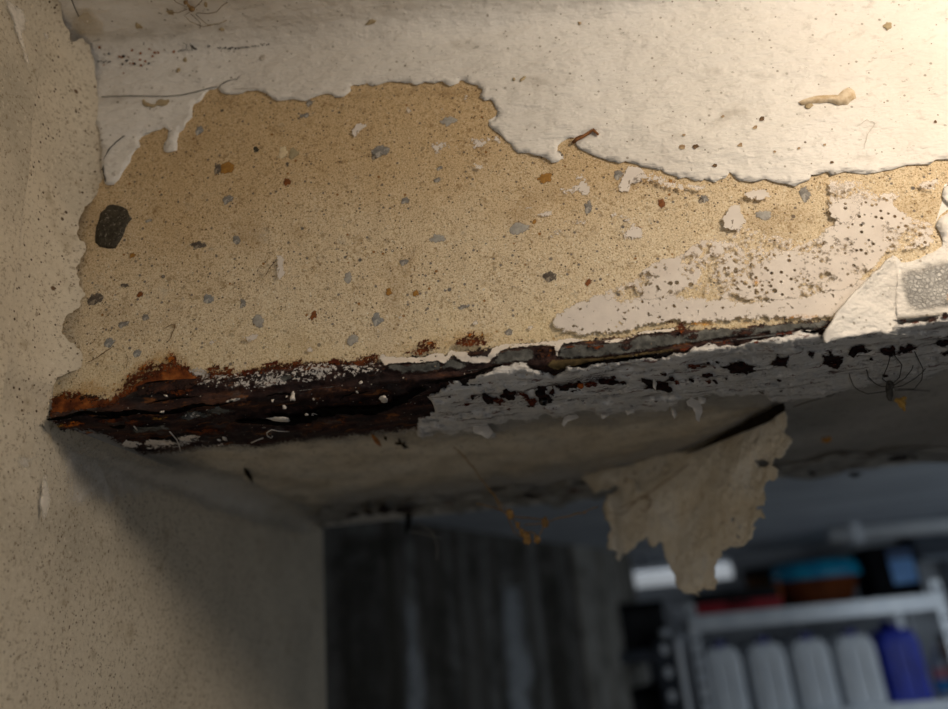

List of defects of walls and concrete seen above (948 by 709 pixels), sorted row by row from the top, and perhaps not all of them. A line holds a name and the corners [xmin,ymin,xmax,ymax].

corrosion [49,316,833,457]
peeling [51,80,948,596]